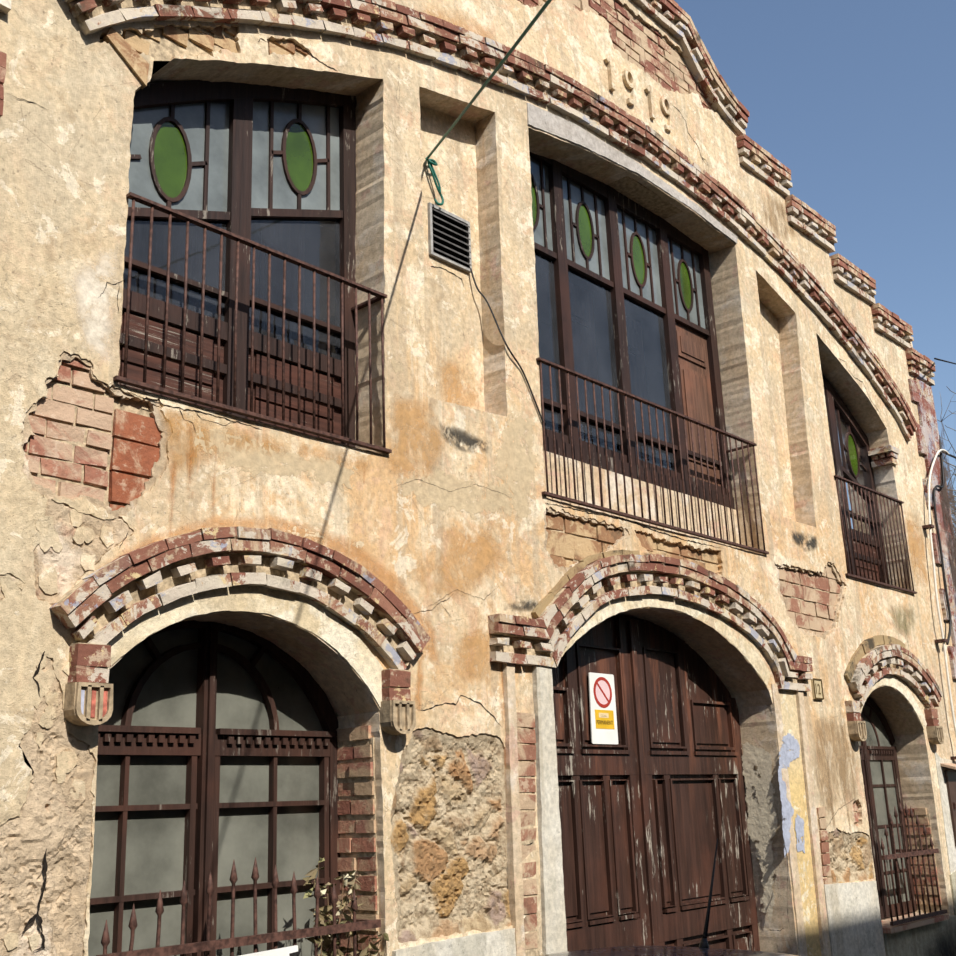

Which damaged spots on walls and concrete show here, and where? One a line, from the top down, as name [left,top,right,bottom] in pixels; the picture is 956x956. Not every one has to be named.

flaking render [0,351,172,606]
flaking render [396,413,719,574]
crack [417,588,497,614]
flaking render [775,562,845,639]
spalling [0,647,98,956]
flaking render [334,725,380,956]
spalling [390,727,511,943]
crack [423,695,504,729]
flaking render [517,712,540,956]
peeling [741,733,805,928]
spalling [816,801,873,884]